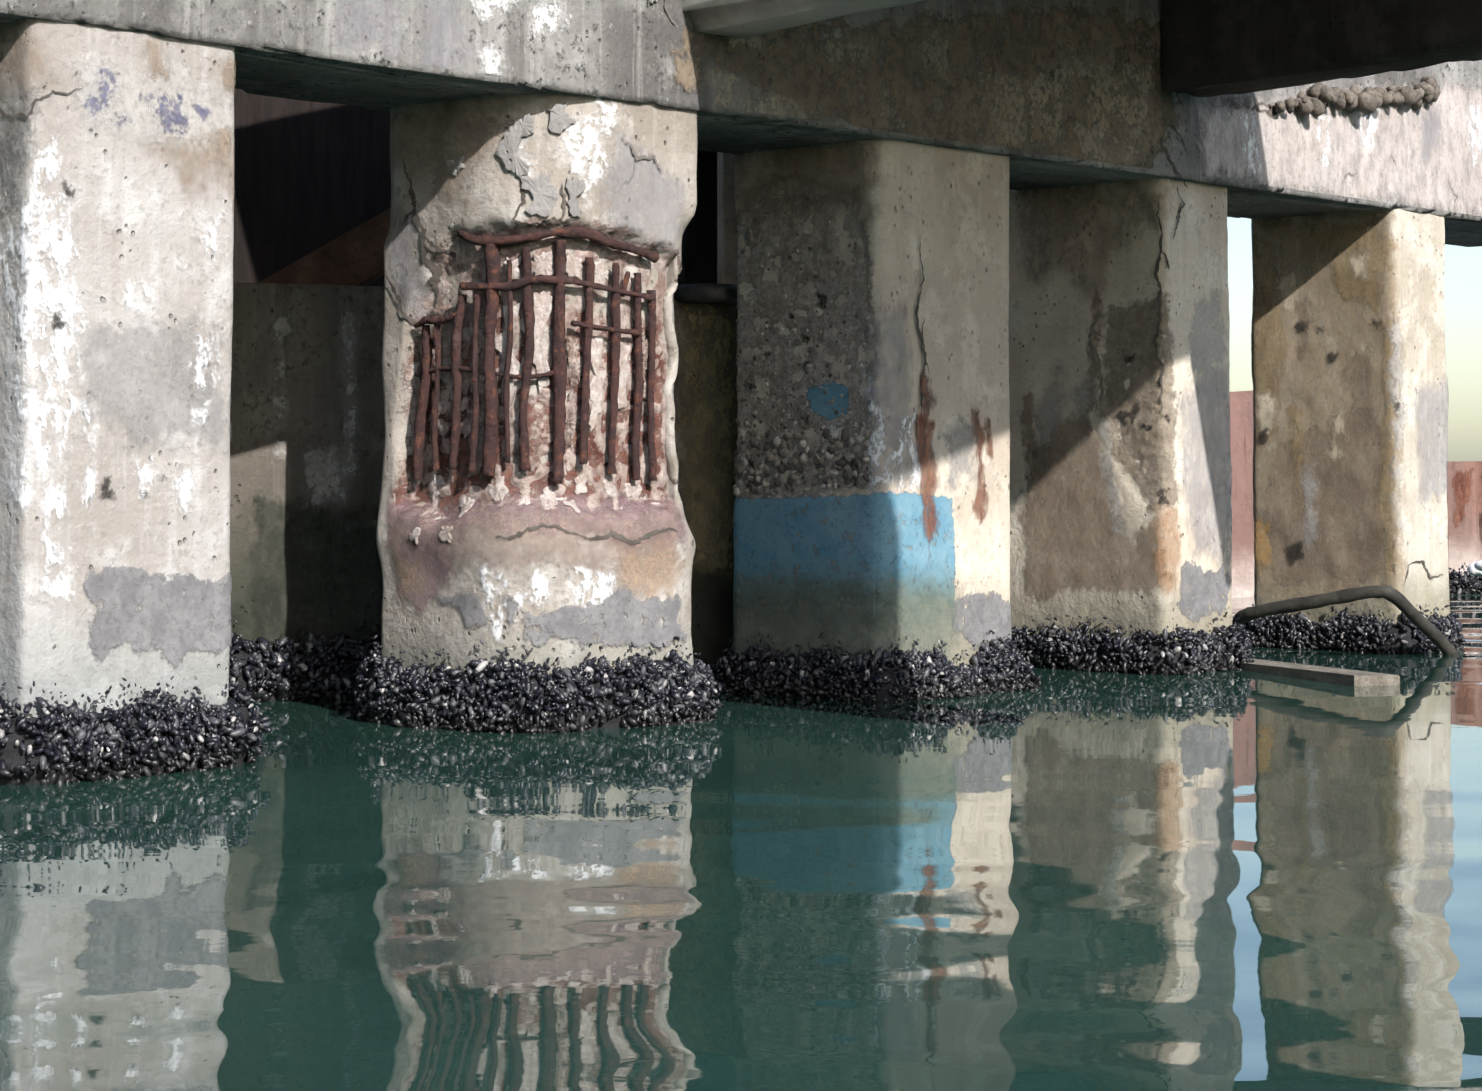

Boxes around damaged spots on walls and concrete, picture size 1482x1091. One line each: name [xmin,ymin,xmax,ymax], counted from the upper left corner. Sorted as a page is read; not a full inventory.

crack [386,156,461,396]
spalling [391,102,682,545]
crack [512,180,582,229]
crack [616,137,663,194]
spalling [732,173,879,500]
crack [915,243,930,416]
crack [1145,118,1189,412]
corrosion [916,373,938,542]
corrosion [972,410,993,522]